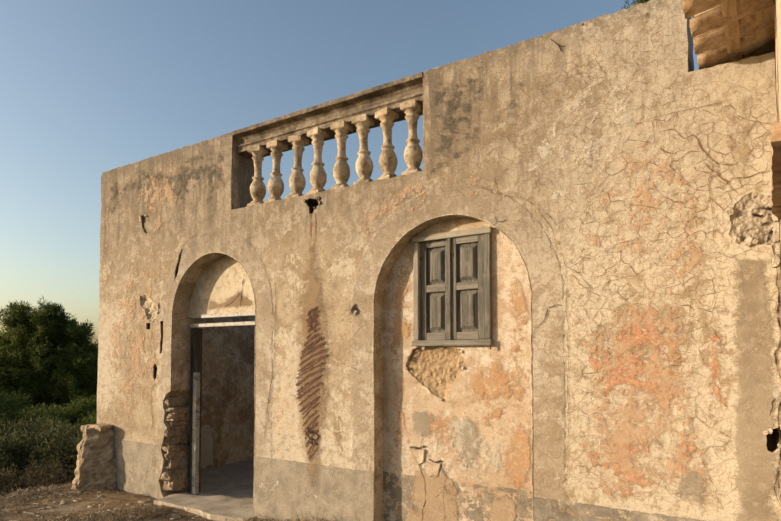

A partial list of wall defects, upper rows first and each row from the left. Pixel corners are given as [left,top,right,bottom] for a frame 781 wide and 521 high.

water stain [105,153,224,233]
crack [469,34,771,496]
spalling [726,193,781,268]
spalling [138,295,159,322]
spalling [405,346,465,401]
crack [410,446,447,520]